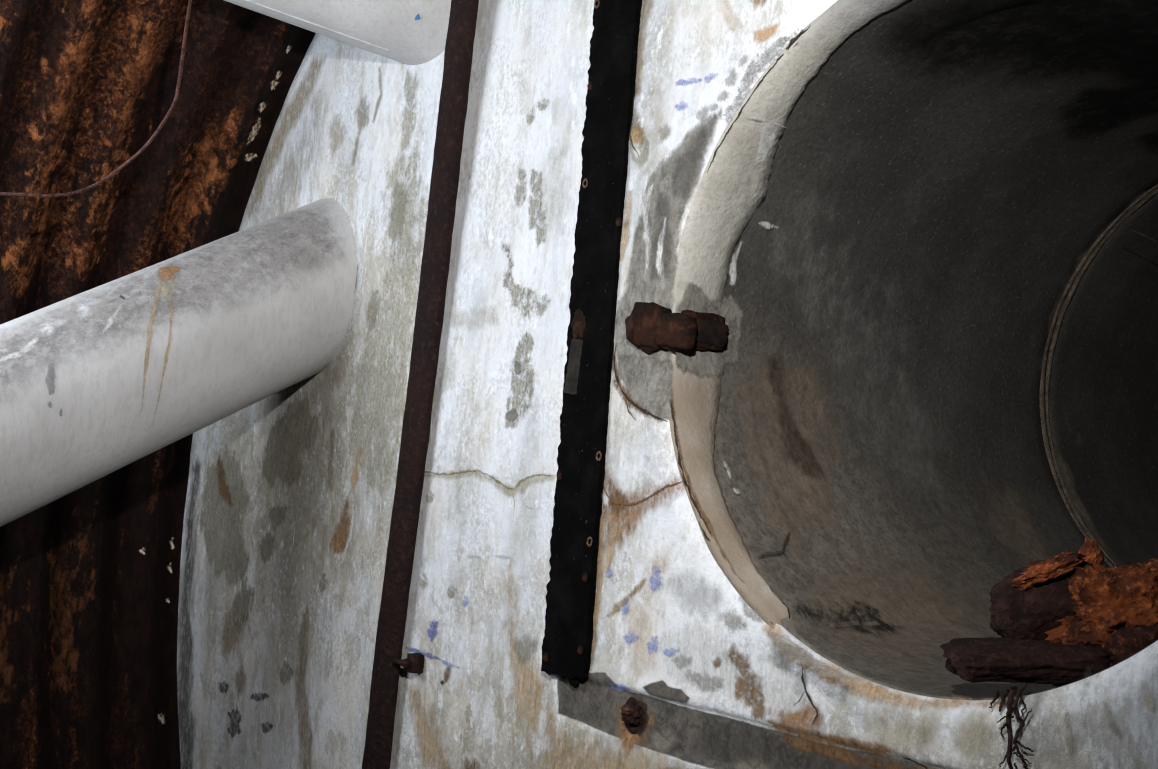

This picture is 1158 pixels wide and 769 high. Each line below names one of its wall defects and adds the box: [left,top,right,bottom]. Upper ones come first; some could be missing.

leakage [635,0,651,94]
corrosion [1,0,171,298]
corrosion [148,108,240,259]
leakage [621,193,631,260]
crack [425,470,555,522]
crack [602,347,773,624]
crack [758,532,790,559]
leakage [177,463,200,769]
corrosion [1011,551,1158,649]
leakage [280,610,311,769]
corrosion [619,701,654,753]
corrosion [767,720,893,756]